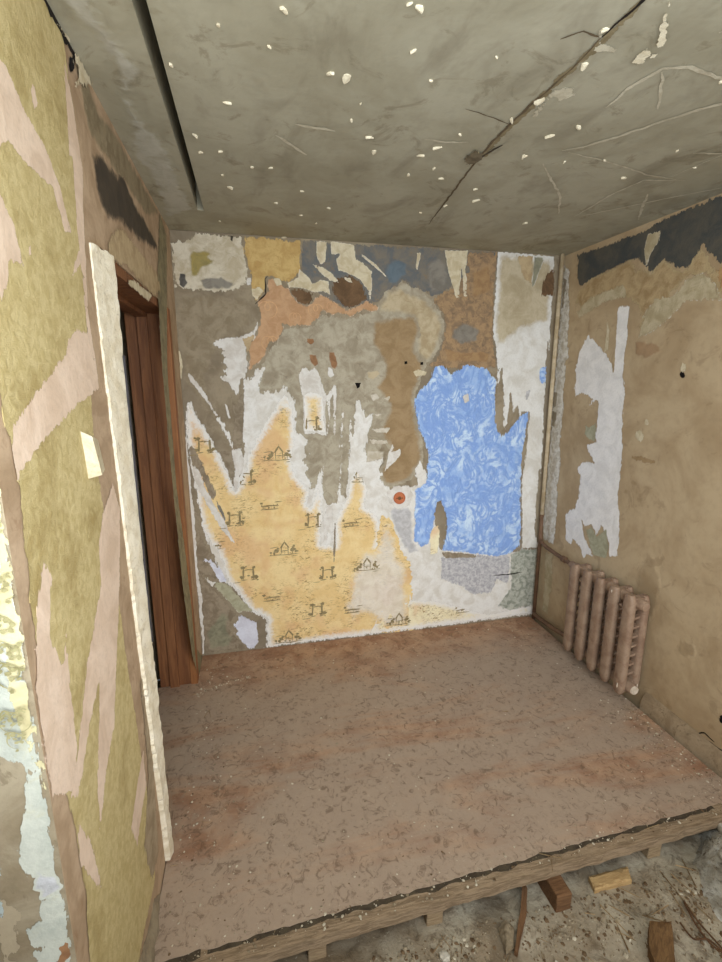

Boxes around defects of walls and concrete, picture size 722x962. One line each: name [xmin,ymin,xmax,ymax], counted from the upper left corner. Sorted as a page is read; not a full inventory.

peeling [57,0,247,674]
peeling [289,240,497,308]
crack [429,0,645,224]
peeling [542,195,722,615]